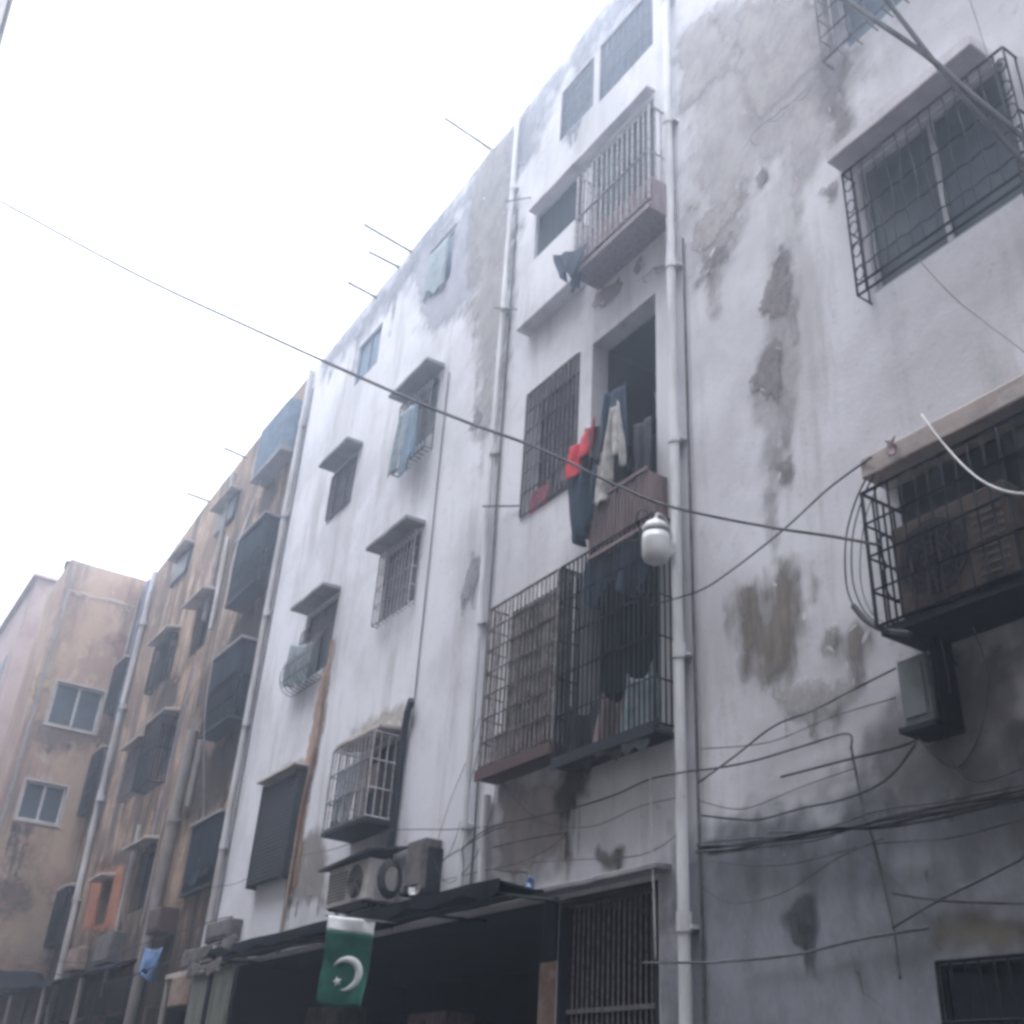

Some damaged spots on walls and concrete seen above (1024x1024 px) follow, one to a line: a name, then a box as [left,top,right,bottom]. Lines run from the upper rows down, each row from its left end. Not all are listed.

water stain [323,0,636,437]
water stain [692,0,846,296]
rust [291,640,334,891]
water stain [498,770,588,880]
water stain [784,895,816,967]
water stain [772,678,856,737]